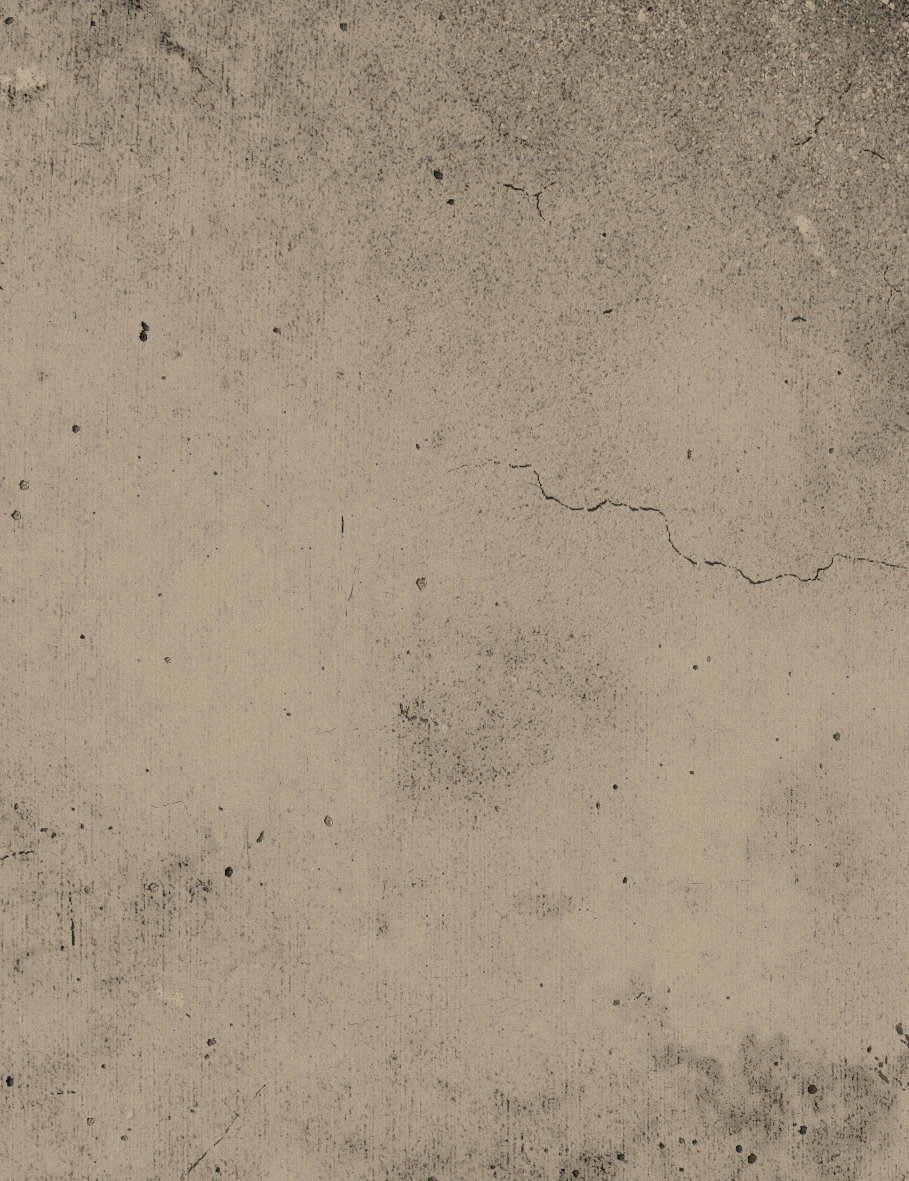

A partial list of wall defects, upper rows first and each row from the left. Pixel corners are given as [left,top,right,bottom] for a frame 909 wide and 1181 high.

crack [504,169,582,228]
crack [444,460,904,587]